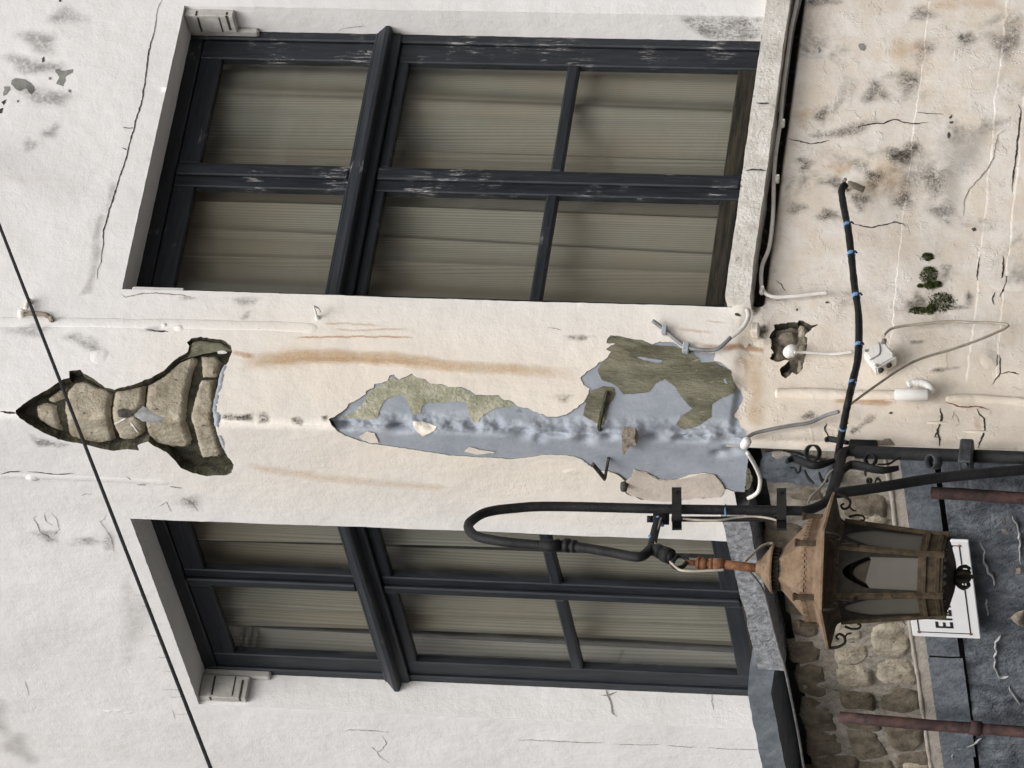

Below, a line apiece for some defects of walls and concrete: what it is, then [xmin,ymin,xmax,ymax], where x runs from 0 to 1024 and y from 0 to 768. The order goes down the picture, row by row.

crack [97,2,161,278]
crack [859,119,928,127]
leakage [891,144,917,163]
crack [963,105,1021,216]
crack [976,256,1004,304]
flaking render [769,309,818,378]
crack [994,355,1017,382]
flaking render [16,337,234,476]
peeling [329,335,753,502]
crack [934,402,986,447]